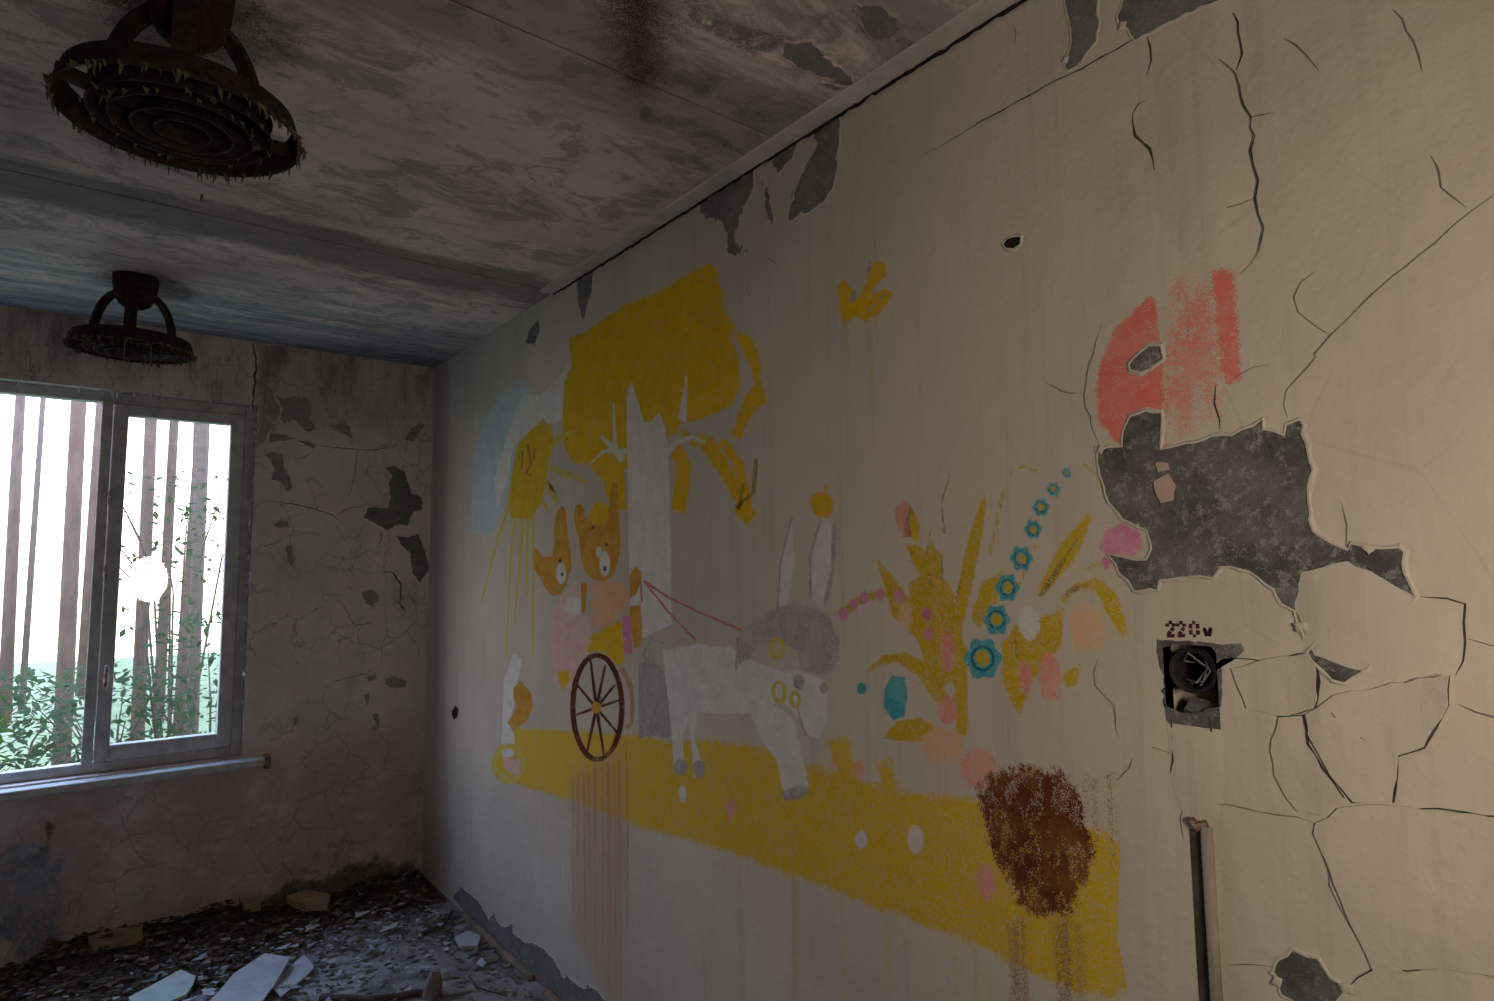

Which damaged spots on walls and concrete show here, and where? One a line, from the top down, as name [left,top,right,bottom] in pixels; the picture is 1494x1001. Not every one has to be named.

leakage [578,0,801,158]
peeling [699,111,843,258]
crack [924,0,1271,271]
crack [1392,8,1423,72]
crack [1214,156,1494,425]
peeling [262,394,355,494]
crack [1046,322,1103,445]
crack [274,445,405,627]
peeling [361,464,430,584]
flaking render [1094,406,1494,977]
peeling [452,885,606,1001]
peeling [1269,946,1356,1001]